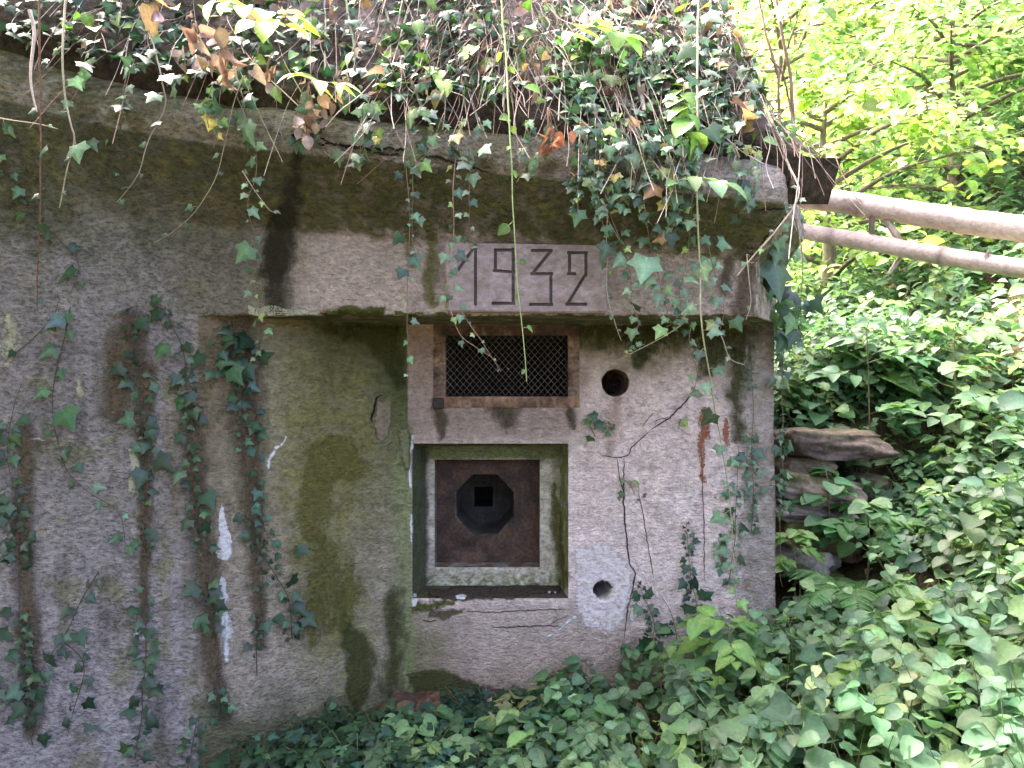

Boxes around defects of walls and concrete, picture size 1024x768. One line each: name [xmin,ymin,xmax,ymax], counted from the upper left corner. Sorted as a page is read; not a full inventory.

leakage [260,138,302,314]
leakage [225,319,267,650]
leakage [299,537,361,647]
spalling [374,400,391,441]
crack [599,386,695,638]
corrosion [697,407,730,483]